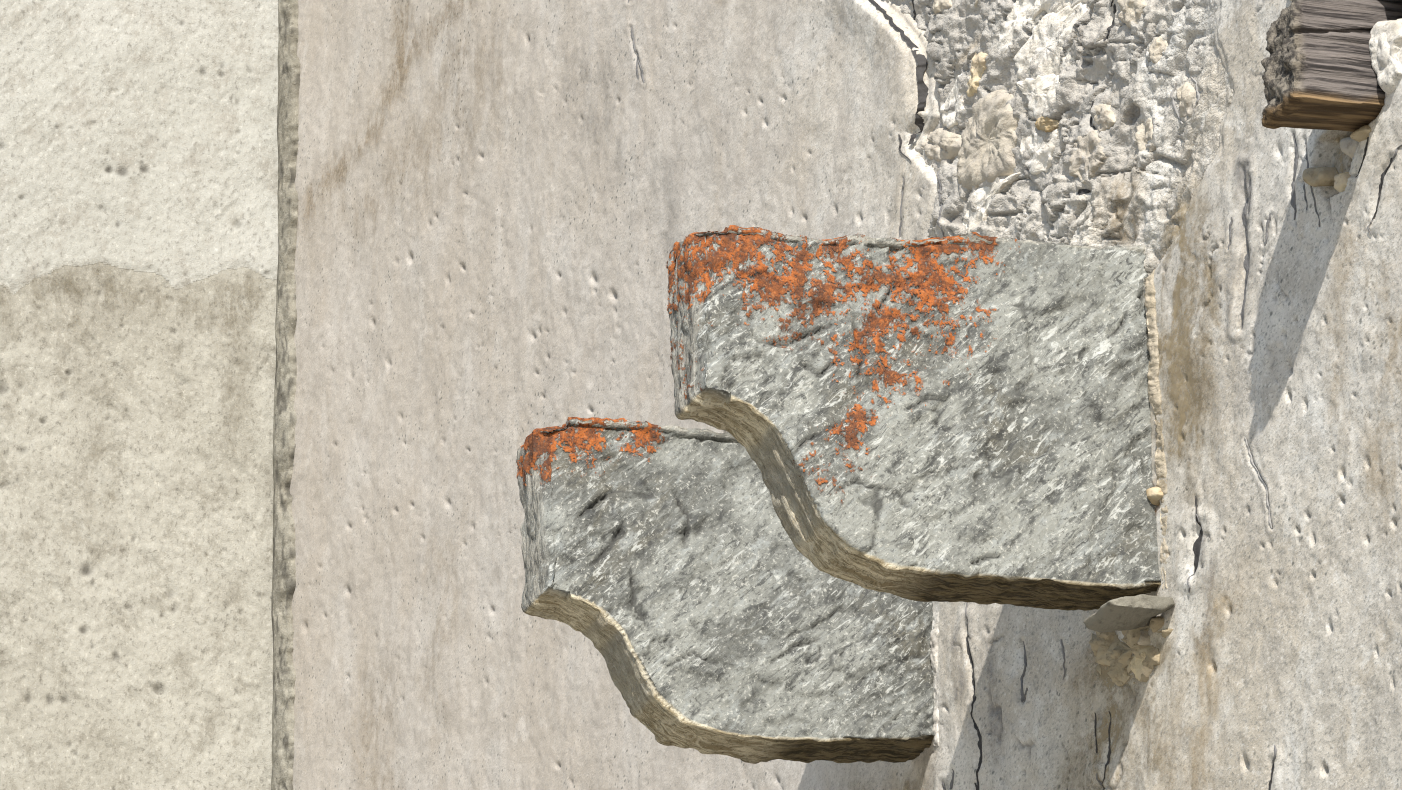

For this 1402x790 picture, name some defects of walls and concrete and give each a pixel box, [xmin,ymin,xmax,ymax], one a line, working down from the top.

crack [628,0,645,82]
flaking render [1369,18,1402,95]
crack [869,0,945,237]
flaking render [886,0,1233,276]
leakage [1237,160,1250,237]
flaking render [1302,125,1372,193]
crack [1355,137,1402,234]
crack [1187,496,1203,593]
crack [941,602,982,790]
crack [1094,711,1111,790]
crack [1268,745,1277,790]